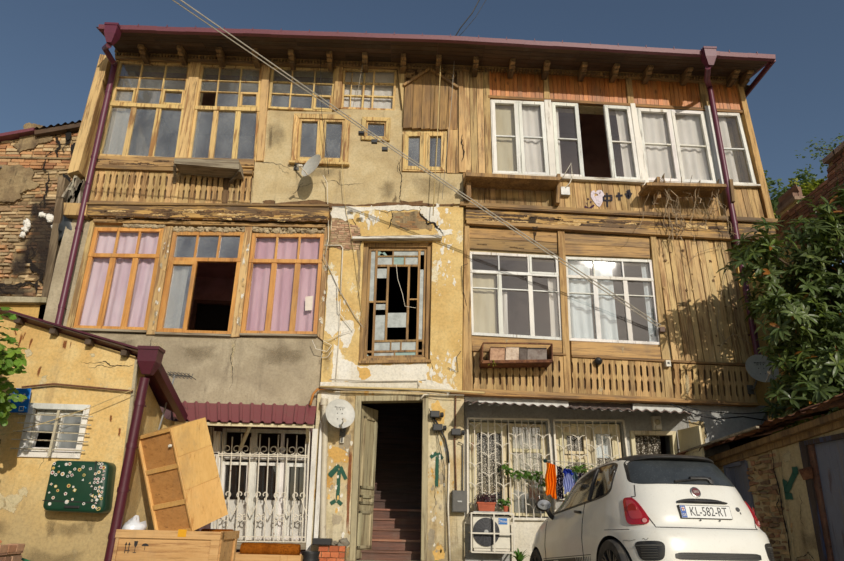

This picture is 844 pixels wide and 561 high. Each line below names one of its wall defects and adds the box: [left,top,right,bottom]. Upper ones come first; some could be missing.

crack [39,135,70,209]
crack [375,162,443,233]
peeling [92,200,456,297]
peeling [319,265,457,560]
crack [771,450,815,561]